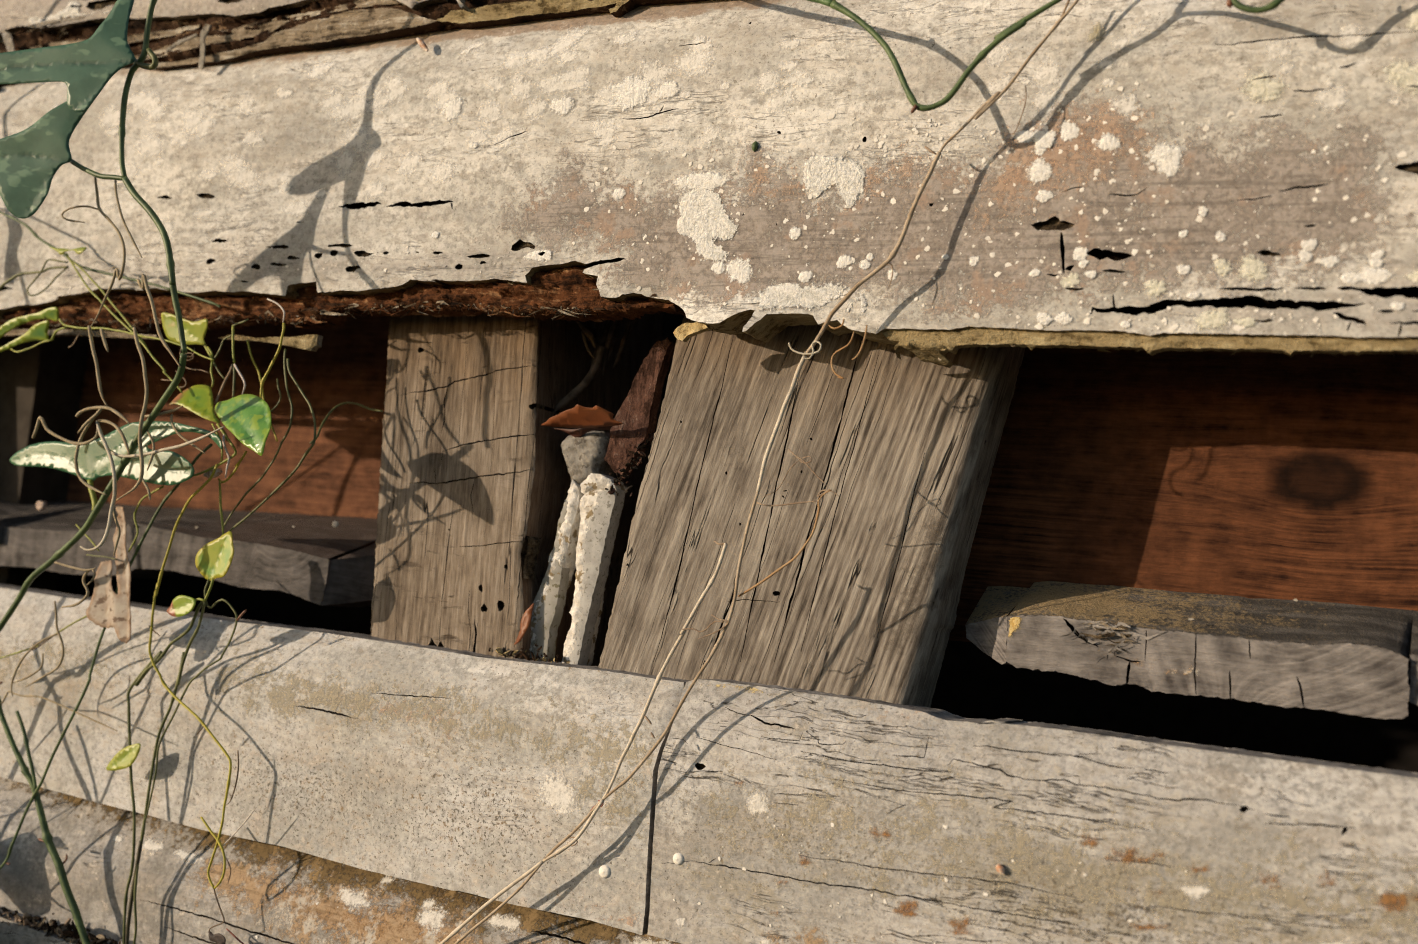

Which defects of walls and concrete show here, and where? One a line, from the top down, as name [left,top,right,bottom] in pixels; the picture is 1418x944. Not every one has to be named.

peeling [2,30,15,52]
peeling [165,24,212,69]
peeling [498,93,1413,324]
crack [1047,232,1132,277]
crack [1090,286,1418,336]
crack [701,337,879,675]
crack [877,453,925,638]
crack [1063,618,1147,685]
crack [1194,633,1251,701]
crack [1296,677,1304,707]
crack [674,707,1355,867]